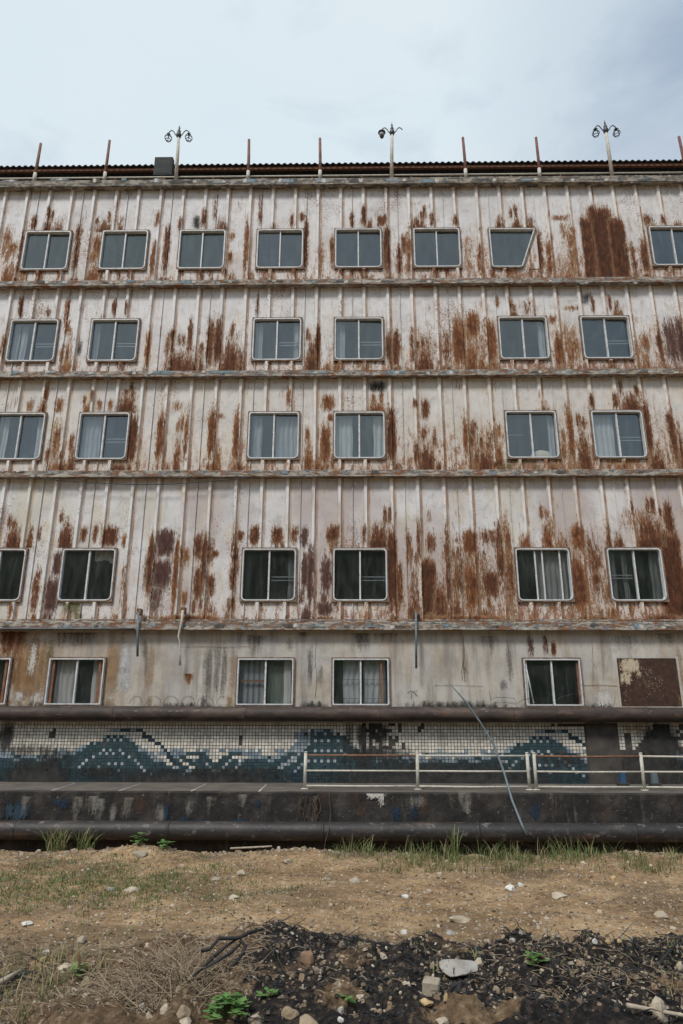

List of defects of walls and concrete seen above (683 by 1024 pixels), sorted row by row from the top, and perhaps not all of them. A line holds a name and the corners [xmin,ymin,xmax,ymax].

rust [461,204,682,278]
rust [161,314,244,371]
rust [384,296,535,370]
rust [634,315,683,368]
rust [0,508,127,692]
rust [142,523,340,622]
rust [361,493,683,622]
leakage [163,647,230,706]
peeling [584,658,664,707]
spalling [367,794,399,822]